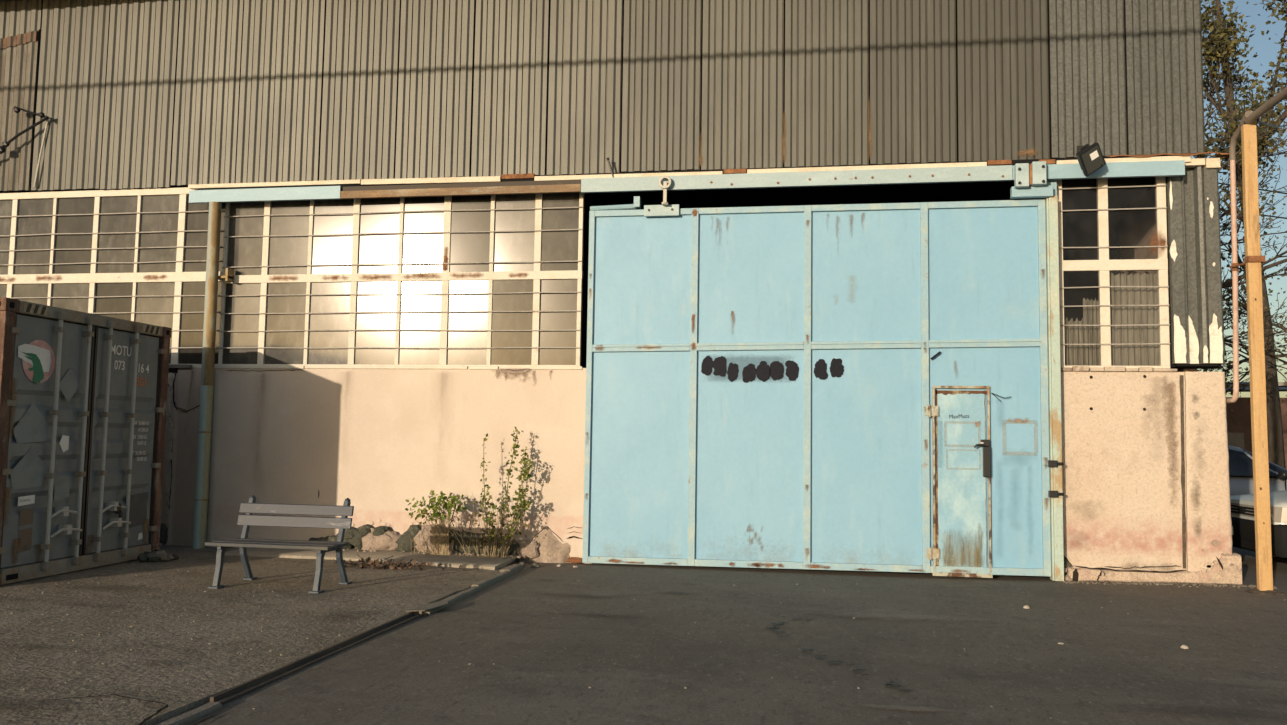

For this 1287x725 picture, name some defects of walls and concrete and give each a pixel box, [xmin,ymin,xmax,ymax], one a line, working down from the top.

water stain [1167,383,1176,471]
rust [910,389,987,572]
flaking render [1201,540,1238,582]